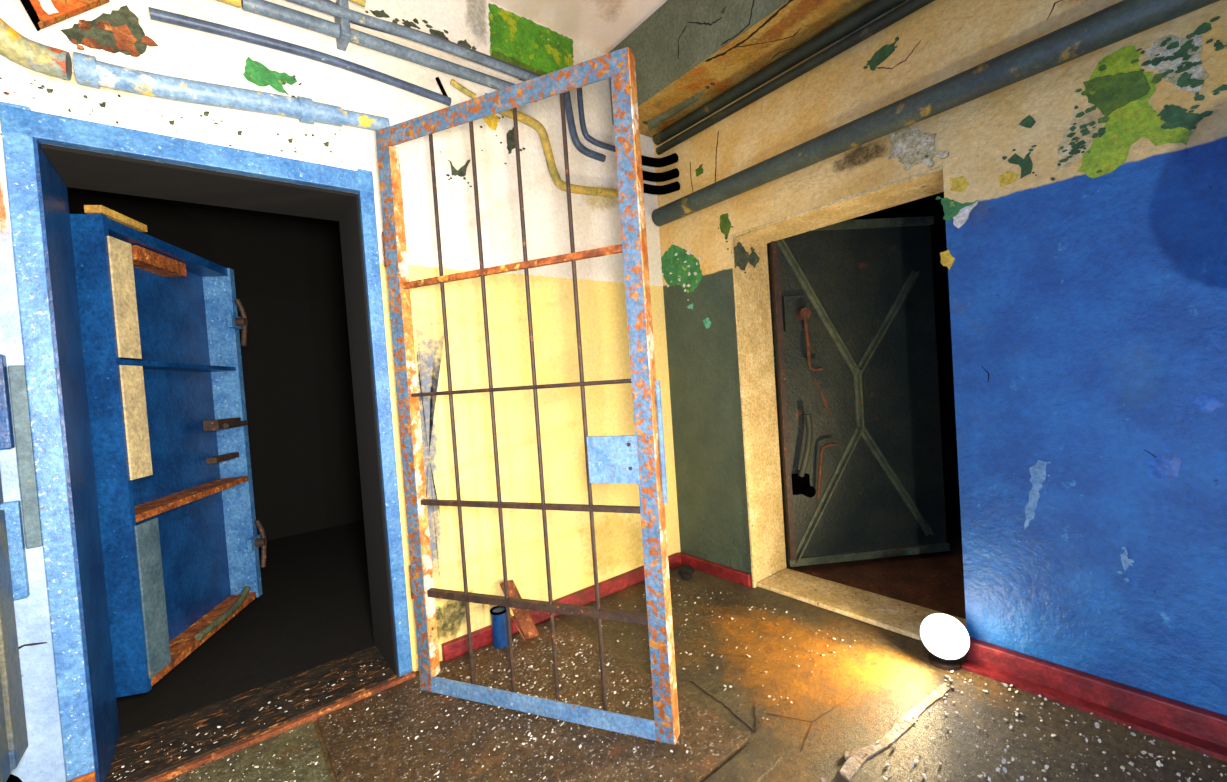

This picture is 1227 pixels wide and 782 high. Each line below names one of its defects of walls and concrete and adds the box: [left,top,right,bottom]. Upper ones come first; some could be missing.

peeling [243,57,302,98]
peeling [997,16,1227,187]
peeling [660,242,703,310]
spalling [821,675,954,782]